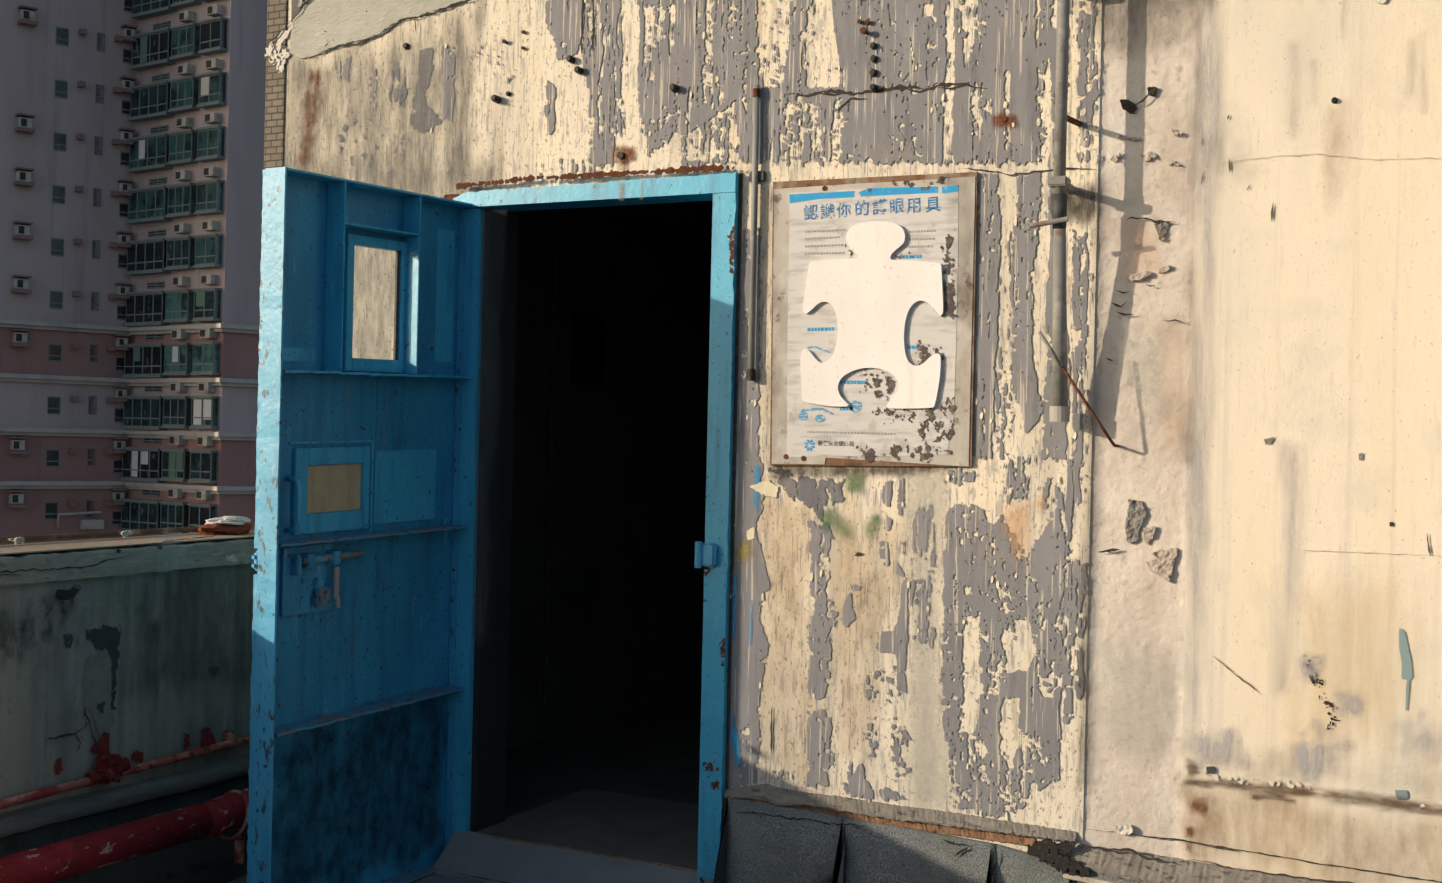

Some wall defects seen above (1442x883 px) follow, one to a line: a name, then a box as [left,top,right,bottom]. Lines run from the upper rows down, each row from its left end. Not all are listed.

spalling [265,0,308,73]
peeling [338,35,515,187]
crack [786,82,988,111]
spalling [1120,86,1157,114]
corrosion [444,147,735,200]
peeling [522,0,1101,820]
spalling [1125,499,1178,582]
peeling [63,624,121,714]